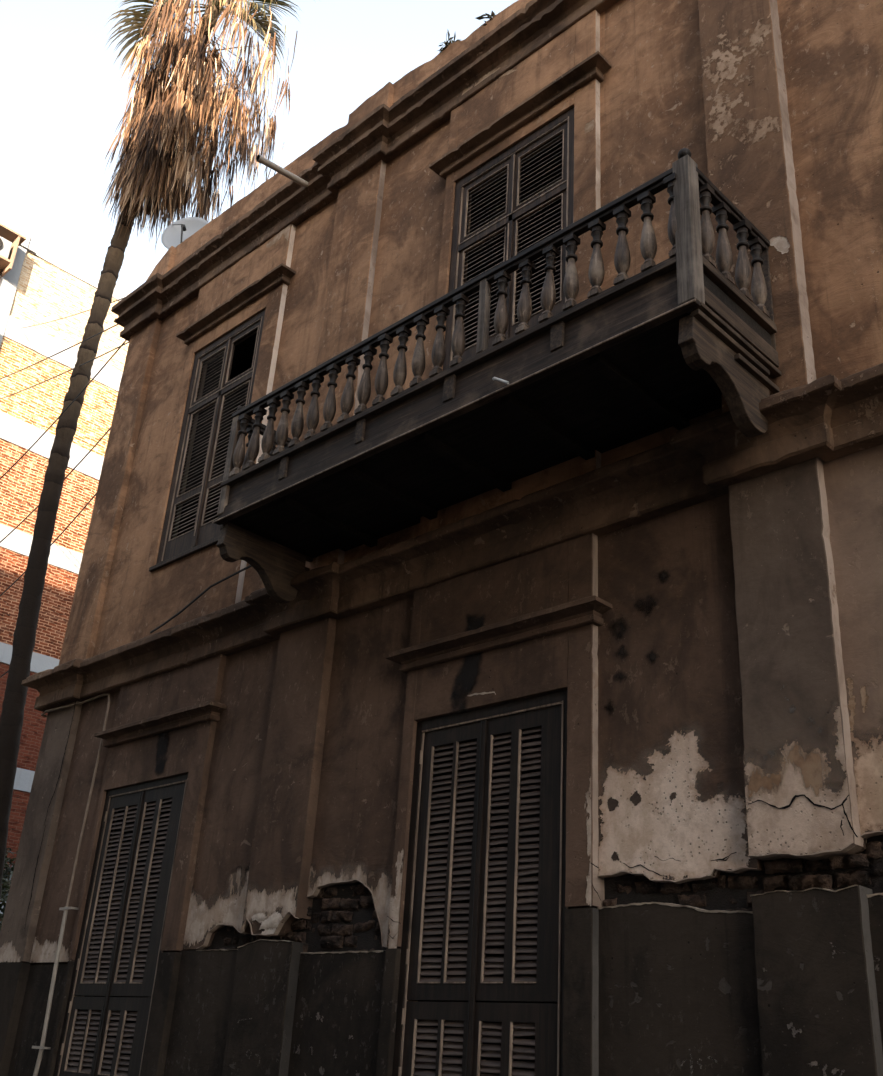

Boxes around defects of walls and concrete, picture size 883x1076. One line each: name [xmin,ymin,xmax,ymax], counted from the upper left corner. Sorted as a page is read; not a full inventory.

peeling [702,18,781,146]
leakage [451,652,482,712]
peeling [584,677,883,914]
crack [748,794,858,837]
flaking render [183,849,404,954]